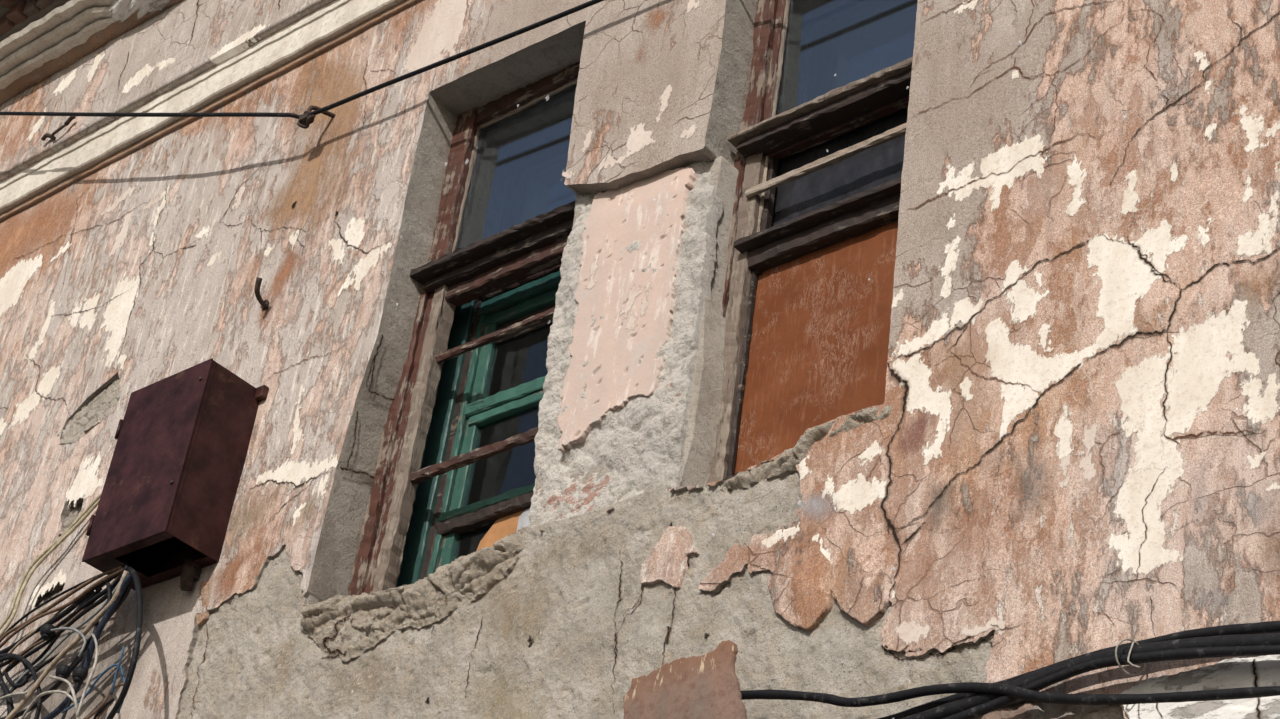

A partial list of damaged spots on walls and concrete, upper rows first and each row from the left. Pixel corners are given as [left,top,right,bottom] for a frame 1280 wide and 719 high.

peeling [402,0,468,76]
crack [907,0,1280,210]
peeling [0,239,72,317]
peeling [58,452,103,536]
peeling [25,269,142,444]
crack [13,130,394,361]
spalling [177,134,1212,719]
crack [880,234,1280,660]
peeling [1105,299,1280,574]
peeling [1234,161,1280,257]
peeling [28,568,67,613]
crack [611,555,699,712]